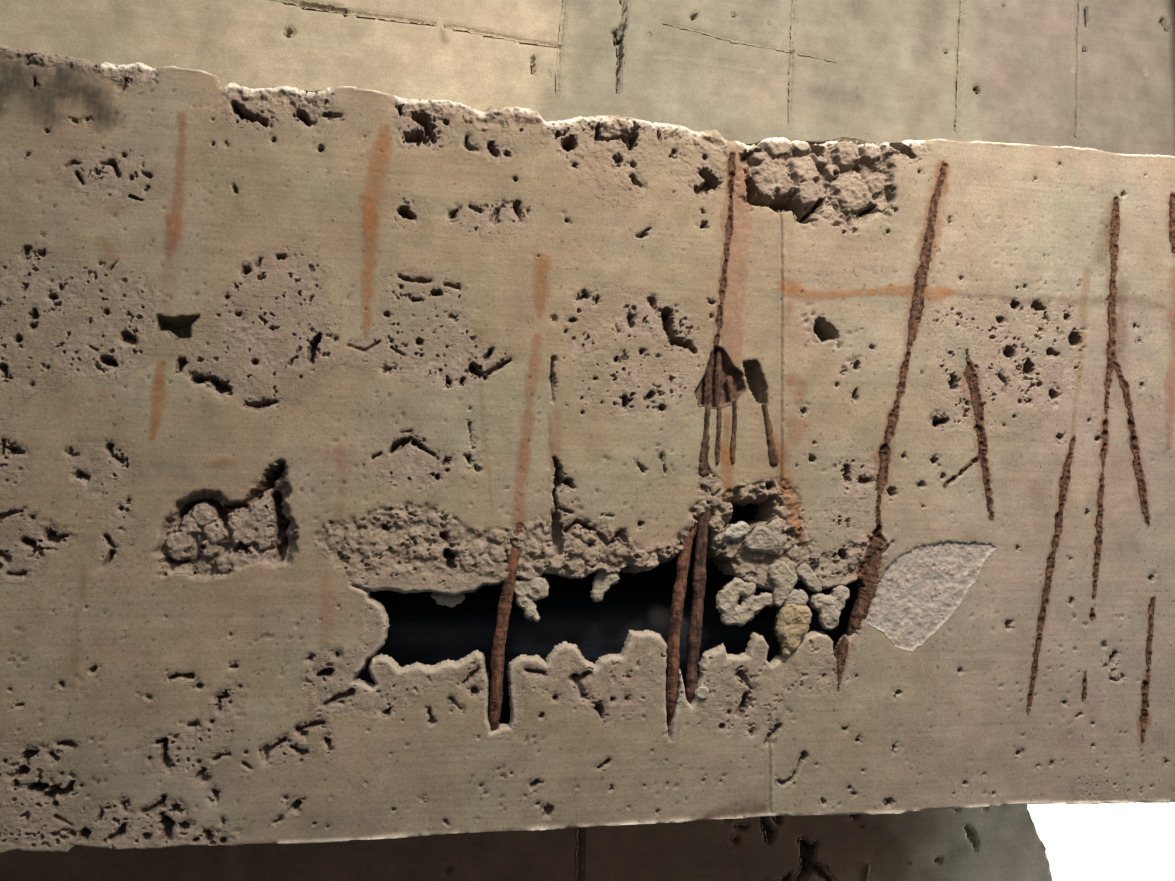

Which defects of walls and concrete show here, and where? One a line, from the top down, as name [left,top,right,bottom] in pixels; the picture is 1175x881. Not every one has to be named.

spalling [216,78,336,135]
spalling [876,140,932,164]
spalling [158,542,208,575]
spalling [174,460,292,563]
corrosion [489,408,530,731]
spalling [261,460,999,763]
corrosion [666,491,712,725]
corrosion [698,151,738,499]
corrosion [781,161,951,691]
corrosion [1027,435,1076,714]
corrosion [1090,196,1150,619]
corrosion [1140,596,1156,744]